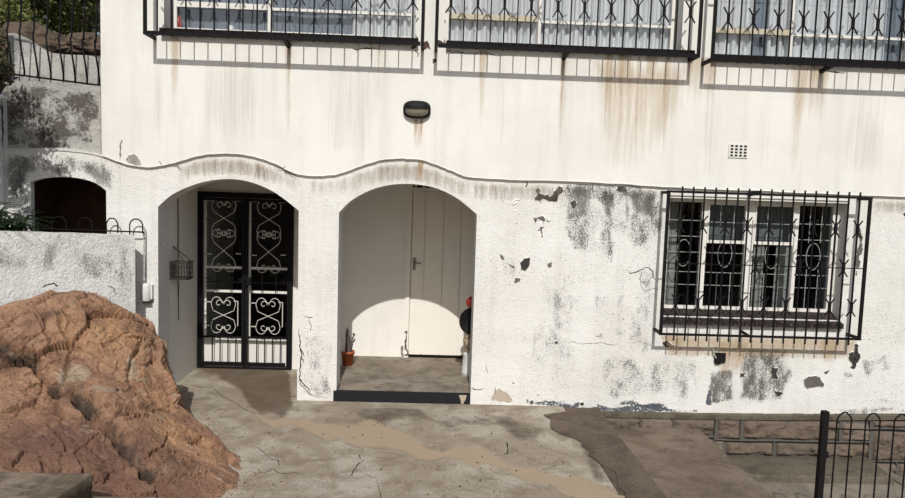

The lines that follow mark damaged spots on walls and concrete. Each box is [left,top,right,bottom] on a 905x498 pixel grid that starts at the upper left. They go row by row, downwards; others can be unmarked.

damp [3,87,110,218]
peeling [535,186,564,202]
damp [563,184,663,259]
peeling [500,255,531,283]
crack [625,267,659,292]
crack [298,316,320,397]
rust [664,338,853,355]
spalling [491,382,515,402]
damp [526,399,584,408]
damp [597,357,696,412]
damp [706,347,792,405]